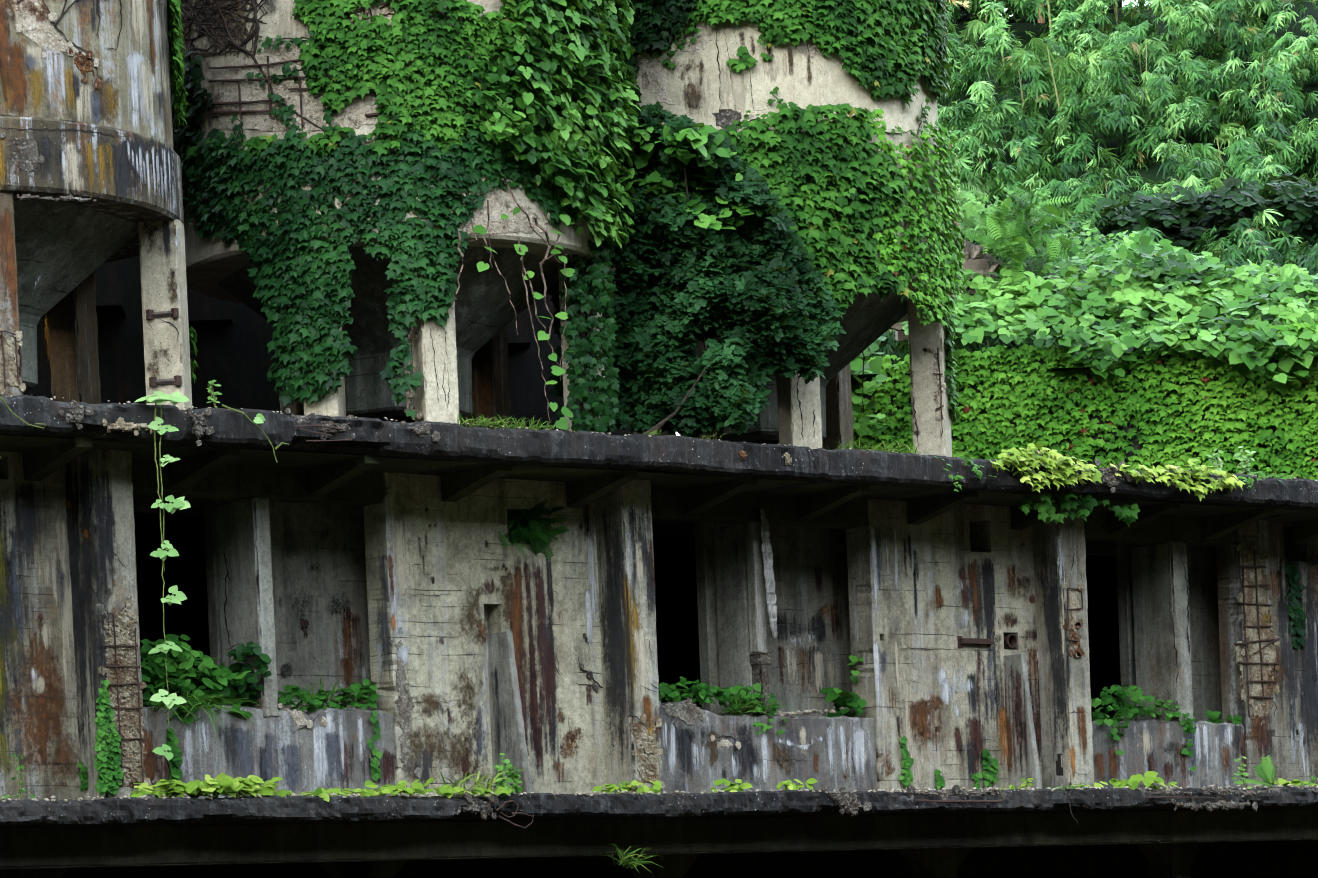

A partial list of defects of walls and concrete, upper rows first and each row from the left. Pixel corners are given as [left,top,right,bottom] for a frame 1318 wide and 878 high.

corrosion [0,0,48,114]
peeling [11,0,102,89]
spalling [0,328,26,395]
spalling [59,400,158,436]
corrosion [13,614,78,787]
leakage [0,462,116,770]
spalling [93,585,152,795]
corrosion [460,559,583,781]
leakage [585,502,708,775]
leakage [722,724,870,779]
corrosion [888,613,1042,778]
spalling [1234,542,1281,726]